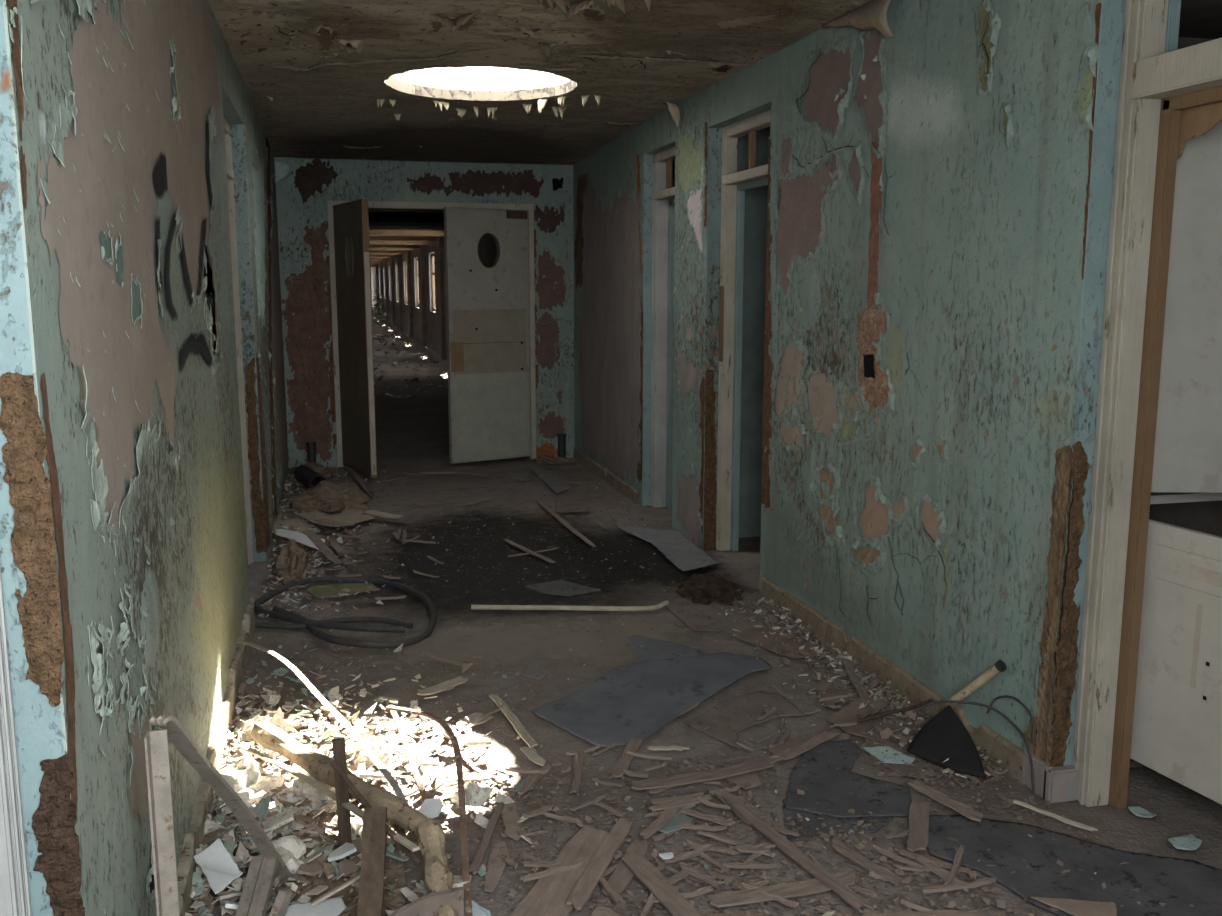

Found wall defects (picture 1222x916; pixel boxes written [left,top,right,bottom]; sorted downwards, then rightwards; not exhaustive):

flaking render [0,372,65,711]
peeling [37,0,481,822]
peeling [405,143,572,370]
peeling [536,389,567,442]
peeling [657,100,708,545]
peeling [774,0,894,302]
peeling [772,292,896,578]
crack [834,522,947,627]
peeling [914,492,947,551]
peeling [972,0,1002,98]
flaking render [32,753,86,916]